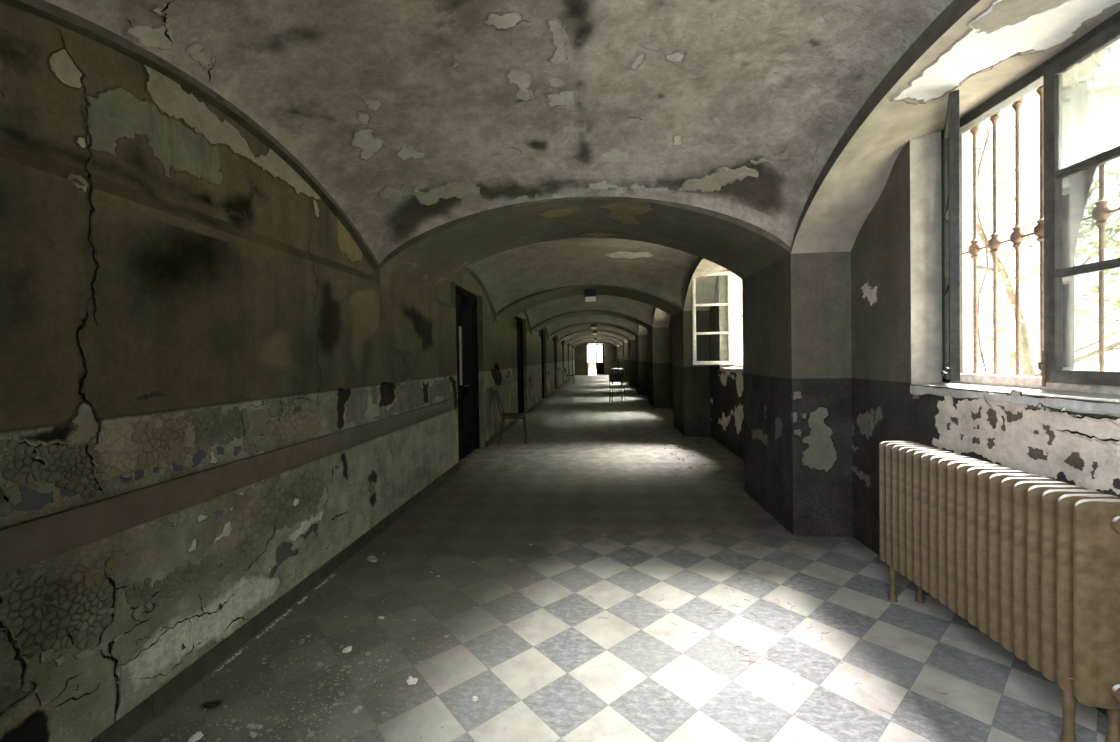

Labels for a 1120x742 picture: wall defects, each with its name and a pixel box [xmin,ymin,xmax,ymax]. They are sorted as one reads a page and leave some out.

spalling [46,5,321,218]
flaking render [505,17,577,107]
flaking render [889,0,1120,103]
spalling [400,179,490,211]
crack [0,28,107,502]
spalling [66,400,100,446]
crack [0,226,364,722]
flaking render [330,377,424,427]
flaking render [710,368,885,489]
spalling [931,389,1120,497]
spalling [268,487,329,579]
spalling [0,627,33,713]